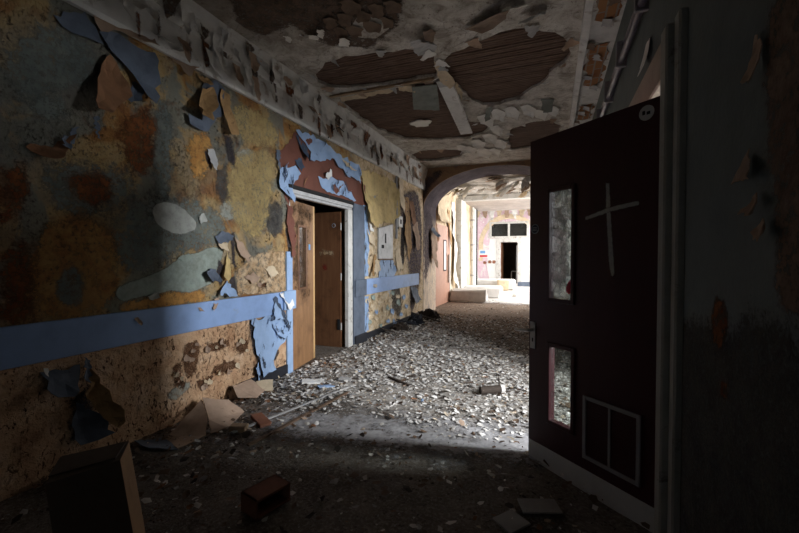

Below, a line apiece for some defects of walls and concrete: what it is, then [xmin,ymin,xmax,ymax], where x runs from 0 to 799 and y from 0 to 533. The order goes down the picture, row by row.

spalling [119,0,610,391]